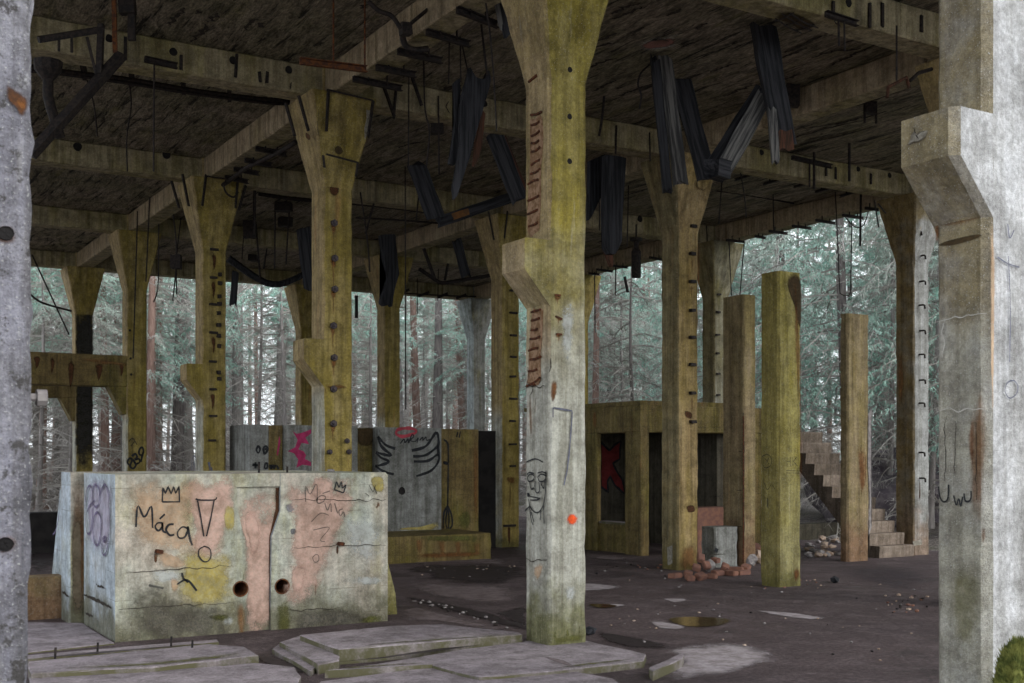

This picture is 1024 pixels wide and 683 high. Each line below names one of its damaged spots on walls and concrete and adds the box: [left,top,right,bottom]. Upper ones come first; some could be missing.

corrosion [969,410,984,499]